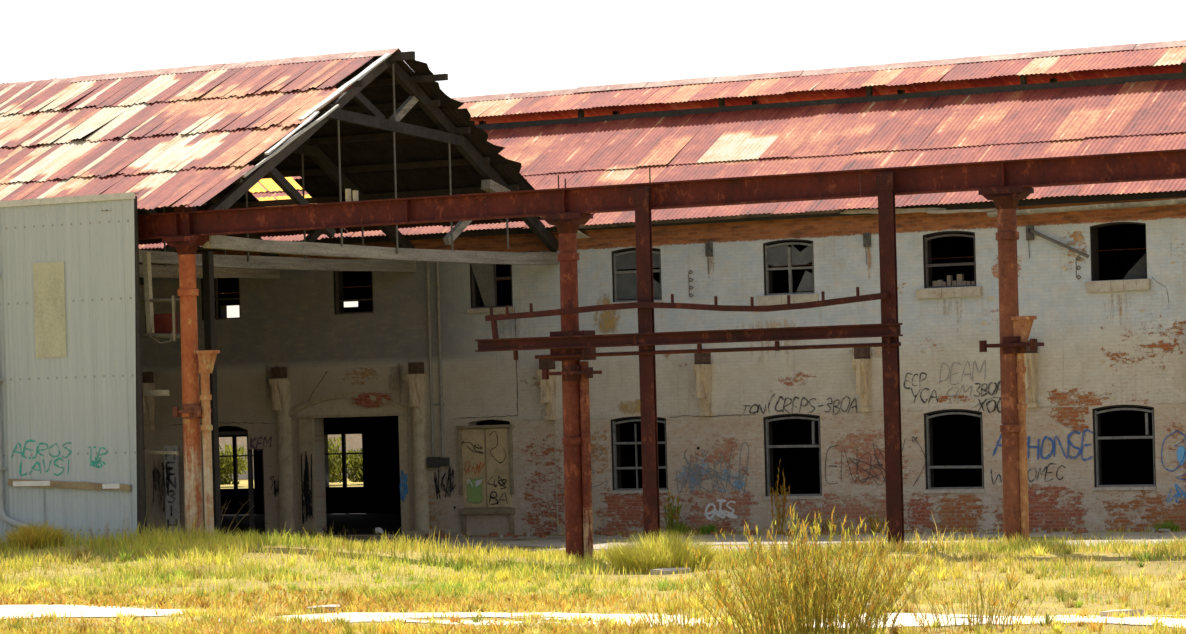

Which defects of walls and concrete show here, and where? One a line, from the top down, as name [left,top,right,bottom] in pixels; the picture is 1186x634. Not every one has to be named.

spalling [338,367,395,408]
peeling [1038,384,1151,434]
peeling [1097,309,1186,371]
peeling [521,434,565,535]
peeling [590,430,644,535]
peeling [659,429,887,534]
peeling [902,434,1003,532]
peeling [1028,420,1186,531]